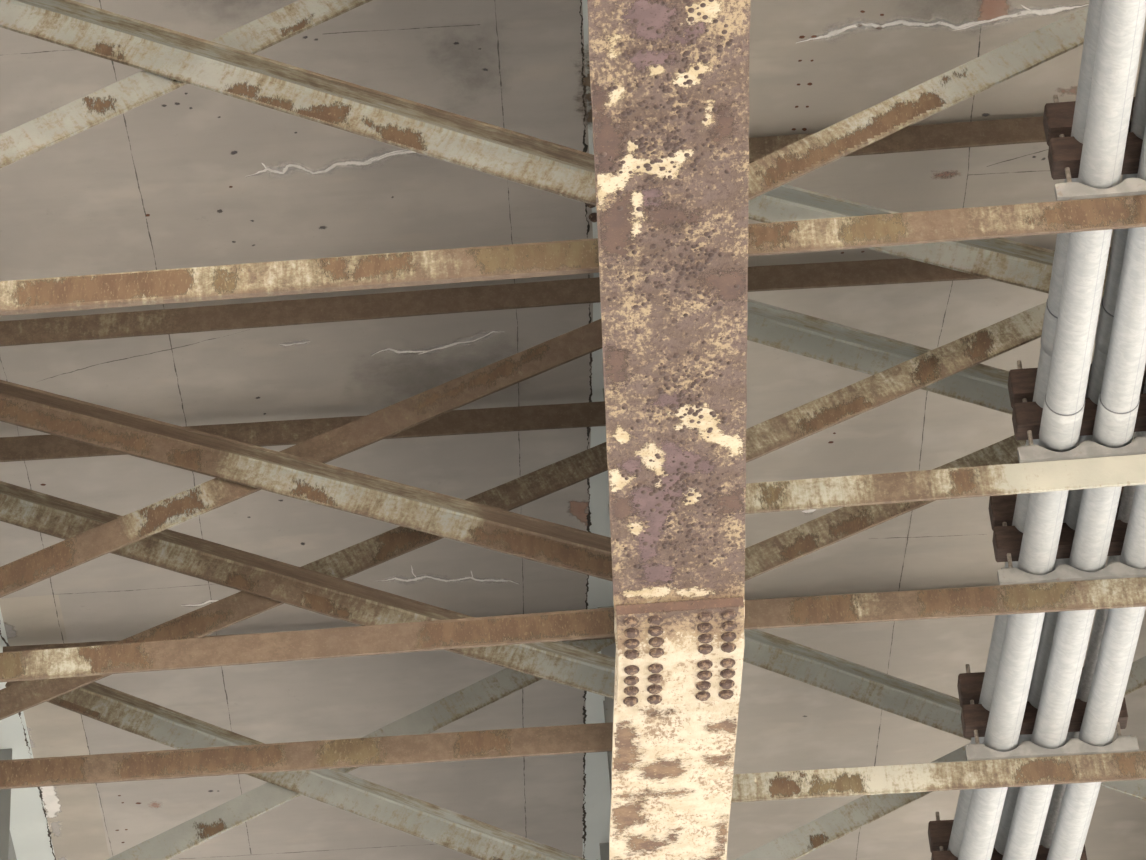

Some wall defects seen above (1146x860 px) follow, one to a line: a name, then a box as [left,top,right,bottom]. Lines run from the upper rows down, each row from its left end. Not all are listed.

crack [796,4,1089,43]
leakage [577,52,593,125]
corrosion [227,82,426,151]
crack [245,149,416,177]
corrosion [468,191,705,274]
corrosion [9,269,194,306]
crack [372,331,498,356]
crack [381,566,518,584]
corrosion [705,719,737,735]
corrosion [0,757,90,787]
corrosion [113,745,285,778]
corrosion [612,721,693,860]